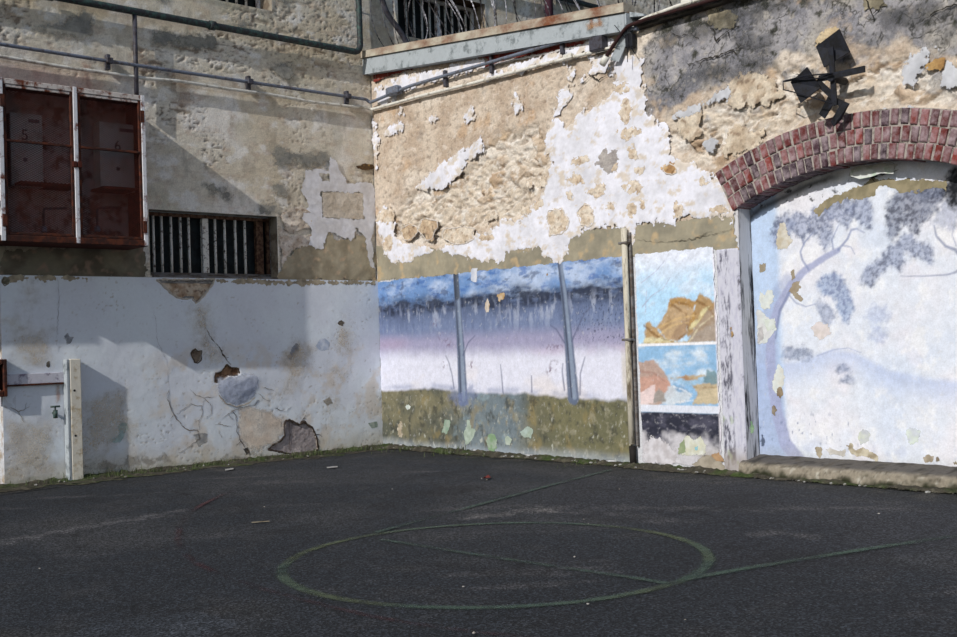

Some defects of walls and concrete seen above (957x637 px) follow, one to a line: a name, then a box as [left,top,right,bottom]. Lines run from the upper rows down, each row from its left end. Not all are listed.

flaking render [707,9,738,30]
flaking render [815,26,839,47]
peeling [901,44,957,89]
peeling [278,36,785,282]
peeling [814,162,947,217]
flaking render [156,278,376,304]
peeling [756,290,777,344]
flaking render [214,364,240,383]
crack [154,315,320,454]
peeling [772,364,785,416]
peeling [238,407,319,455]
peeling [815,429,878,461]